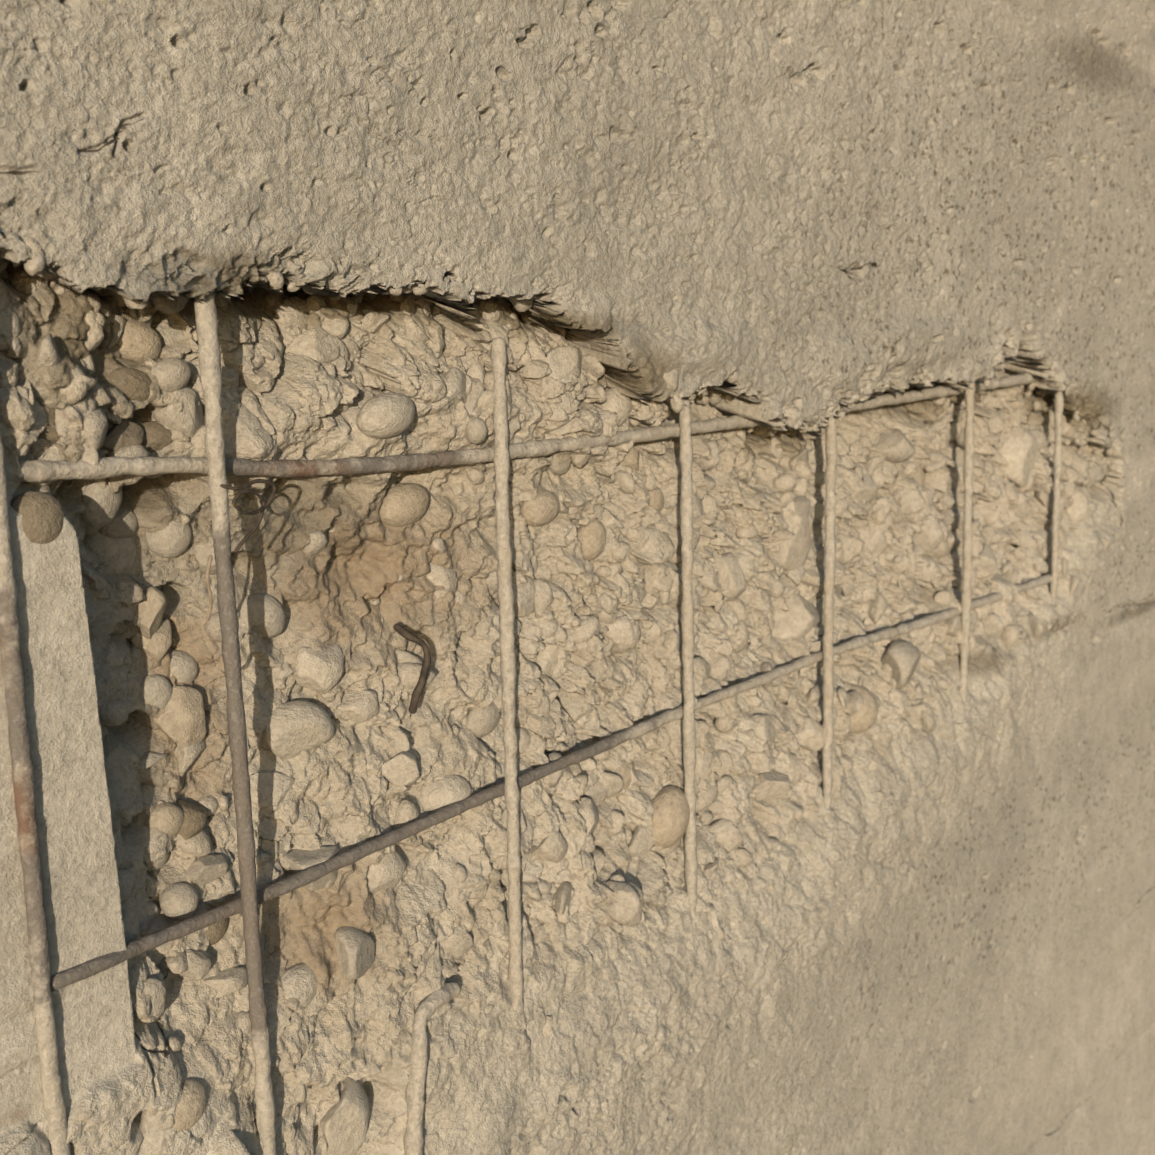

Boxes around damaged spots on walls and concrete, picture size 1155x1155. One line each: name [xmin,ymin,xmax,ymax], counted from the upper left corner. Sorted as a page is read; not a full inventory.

hole [584,0,633,38]
spalling [171,33,187,50]
hole [516,22,542,51]
spalling [20,76,36,92]
spalling [244,79,257,96]
hole [496,64,513,81]
hole [784,60,835,95]
hole [458,91,496,123]
spalling [122,134,140,151]
spalling [260,179,274,191]
spalling [0,231,1125,1155]